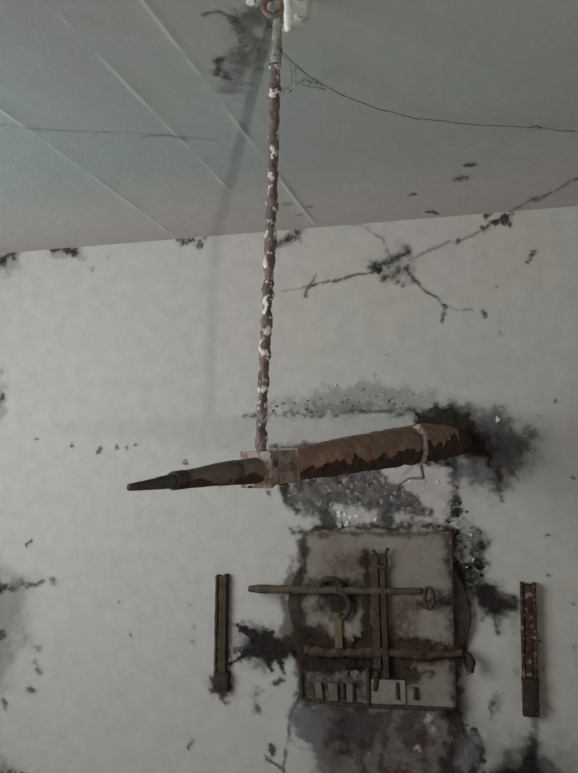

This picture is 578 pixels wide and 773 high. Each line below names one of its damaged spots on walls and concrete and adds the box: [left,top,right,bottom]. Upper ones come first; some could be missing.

crack [480,189,558,230]
crack [304,248,446,322]
spalling [279,461,489,581]
leakage [469,569,517,635]
leakage [289,704,463,773]